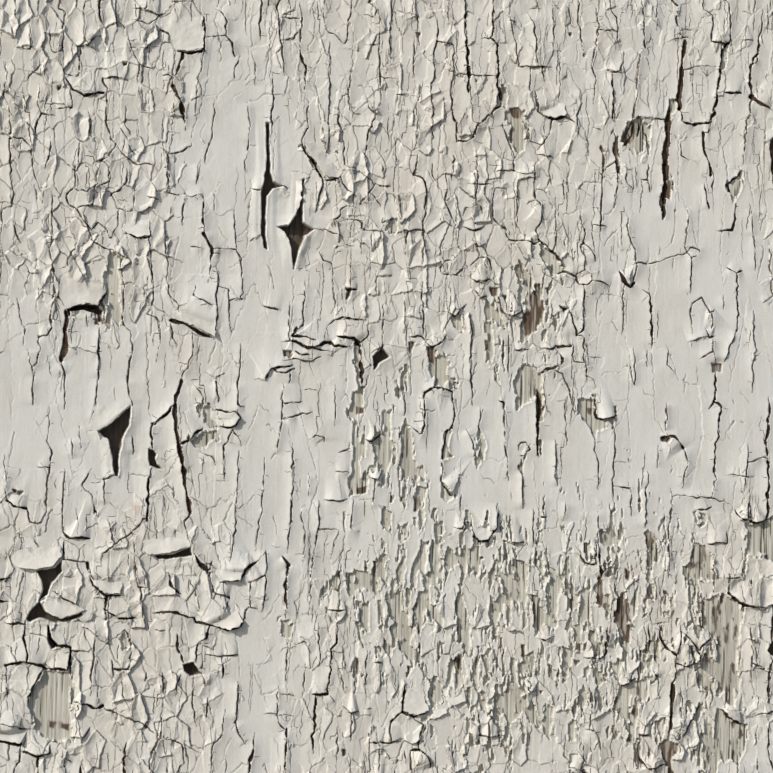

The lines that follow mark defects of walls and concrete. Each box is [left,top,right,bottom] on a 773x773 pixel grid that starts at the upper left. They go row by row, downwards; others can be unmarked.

peeling [298,145,327,179]
crack [0,0,269,773]
peeling [475,291,529,385]
peeling [510,241,565,341]
peeling [321,340,668,773]
peeling [742,516,773,576]
peeling [617,456,757,773]
peeling [28,670,76,742]